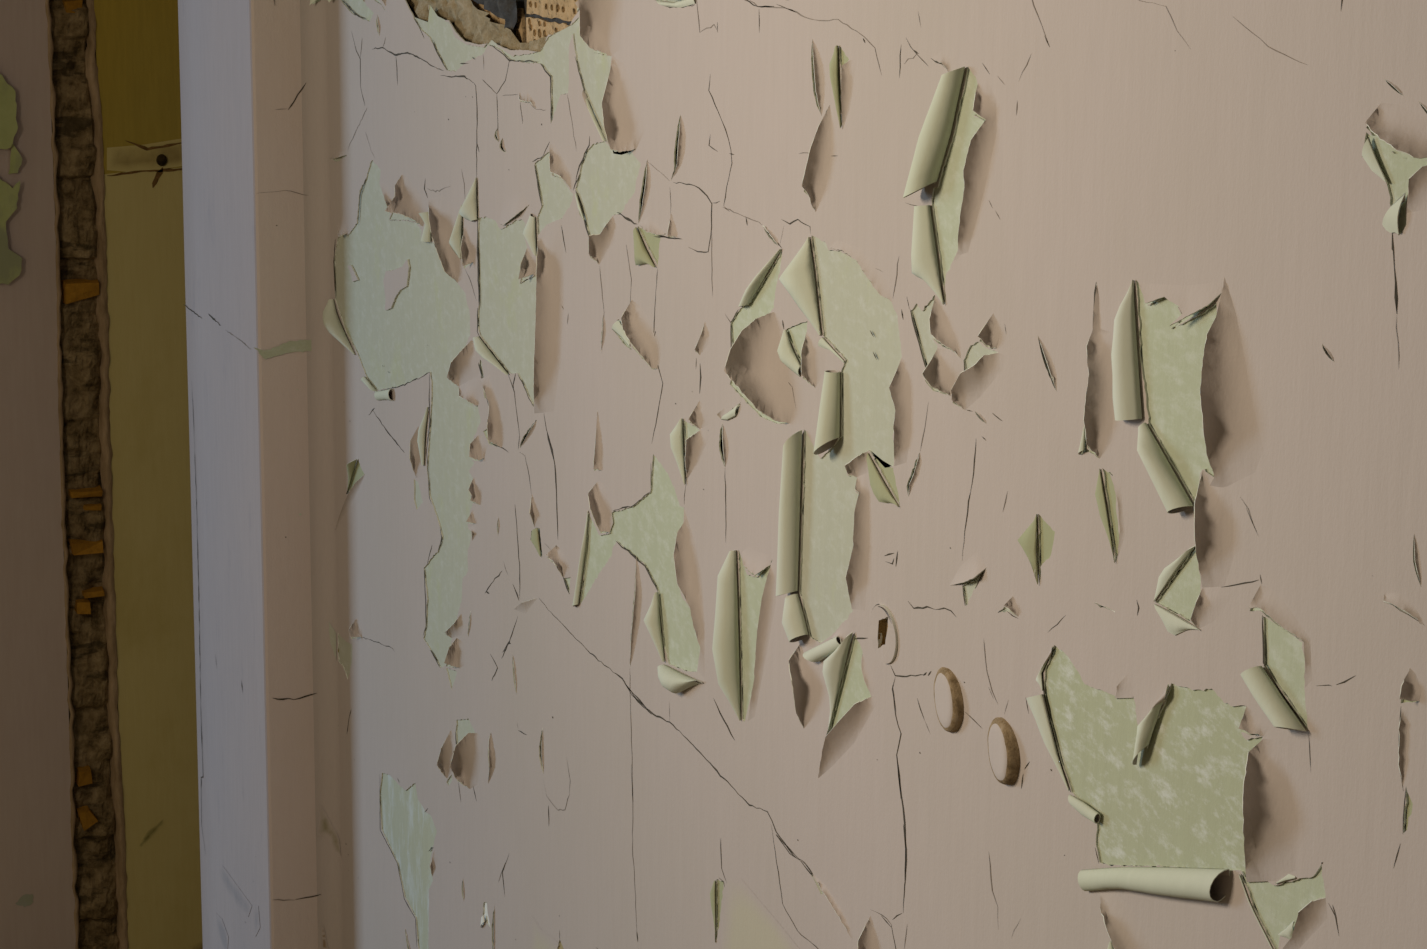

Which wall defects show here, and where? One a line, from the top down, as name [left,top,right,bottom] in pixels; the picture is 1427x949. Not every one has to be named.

crack [655,81,810,281]
crack [745,0,927,75]
crack [982,0,1049,113]
peeling [1362,103,1427,251]
spalling [45,0,128,949]
peeling [437,719,483,801]
peeling [309,0,680,687]
crack [485,373,818,949]
peeling [529,45,1006,778]
crack [890,665,931,947]
crack [871,604,953,622]
peeling [1025,277,1339,949]